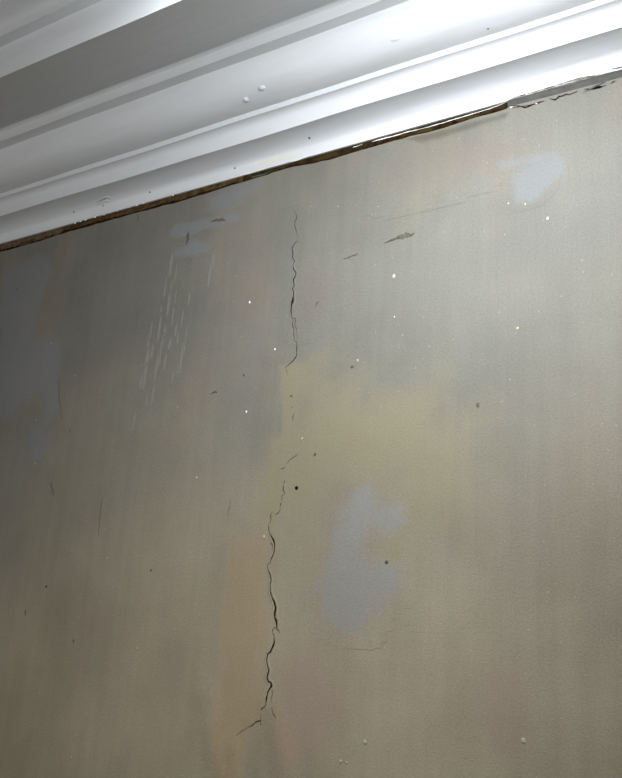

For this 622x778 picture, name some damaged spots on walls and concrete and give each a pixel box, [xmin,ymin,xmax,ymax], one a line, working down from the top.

crack [285,215,299,374]
crack [239,455,296,733]